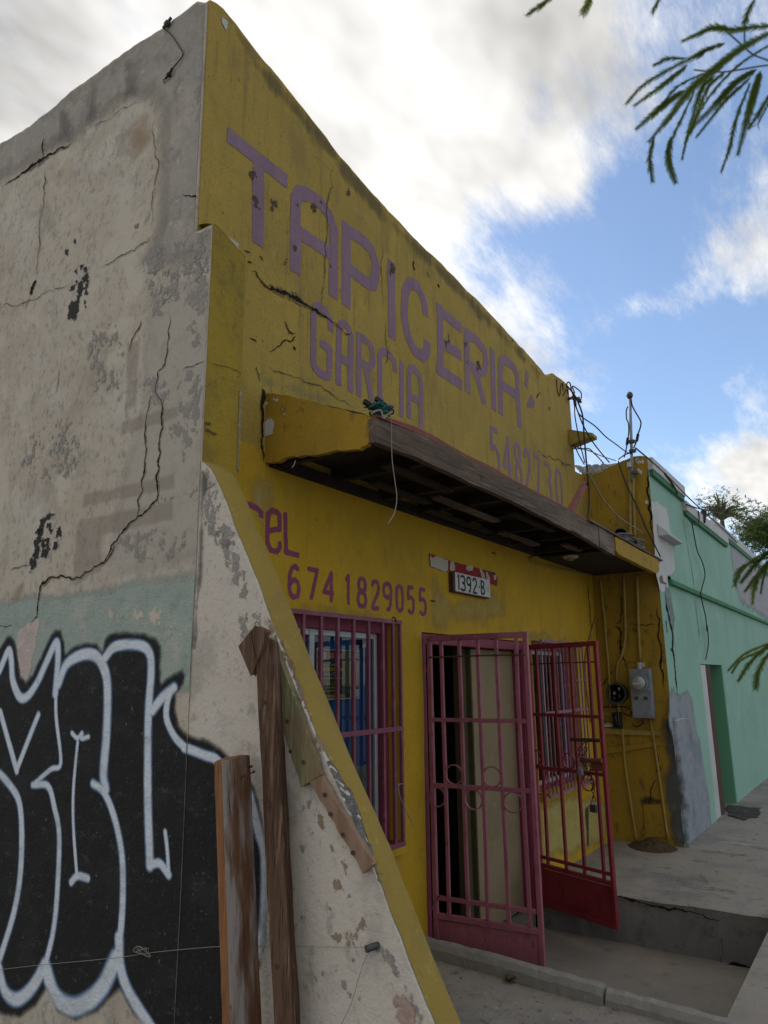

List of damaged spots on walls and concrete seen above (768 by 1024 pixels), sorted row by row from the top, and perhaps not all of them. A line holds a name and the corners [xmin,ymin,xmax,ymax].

crack [0,118,352,627]
crack [645,467,653,534]
crack [587,585,677,686]
crack [617,896,724,962]
peeling [375,945,422,1024]